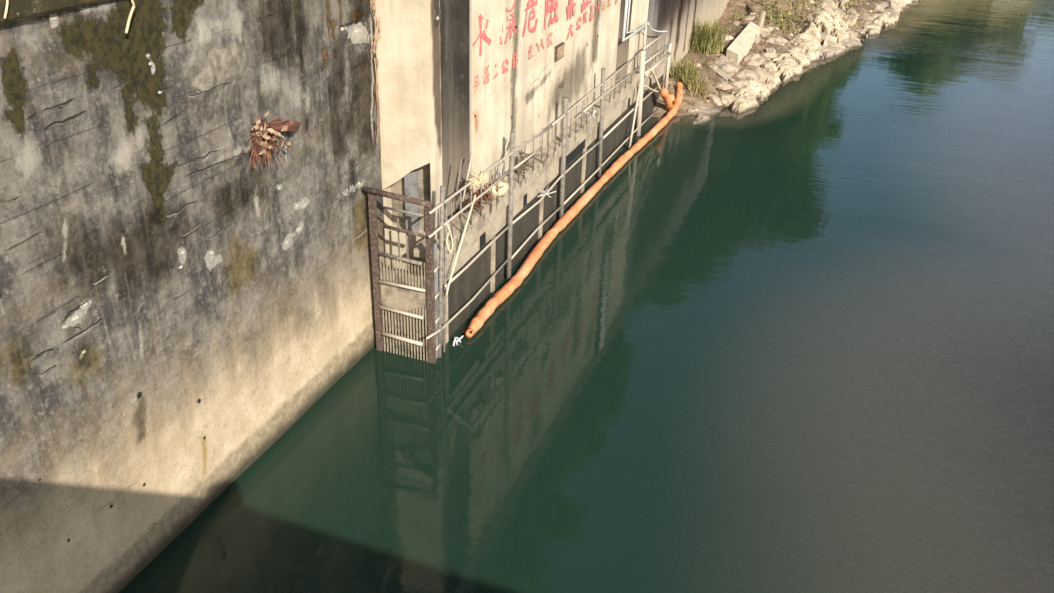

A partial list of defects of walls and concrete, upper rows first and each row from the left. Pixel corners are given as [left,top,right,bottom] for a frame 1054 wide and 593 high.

rust [322,0,364,67]
spalling [341,20,370,45]
damp [659,0,697,58]
damp [85,58,100,88]
damp [109,83,164,174]
spalling [61,298,92,329]